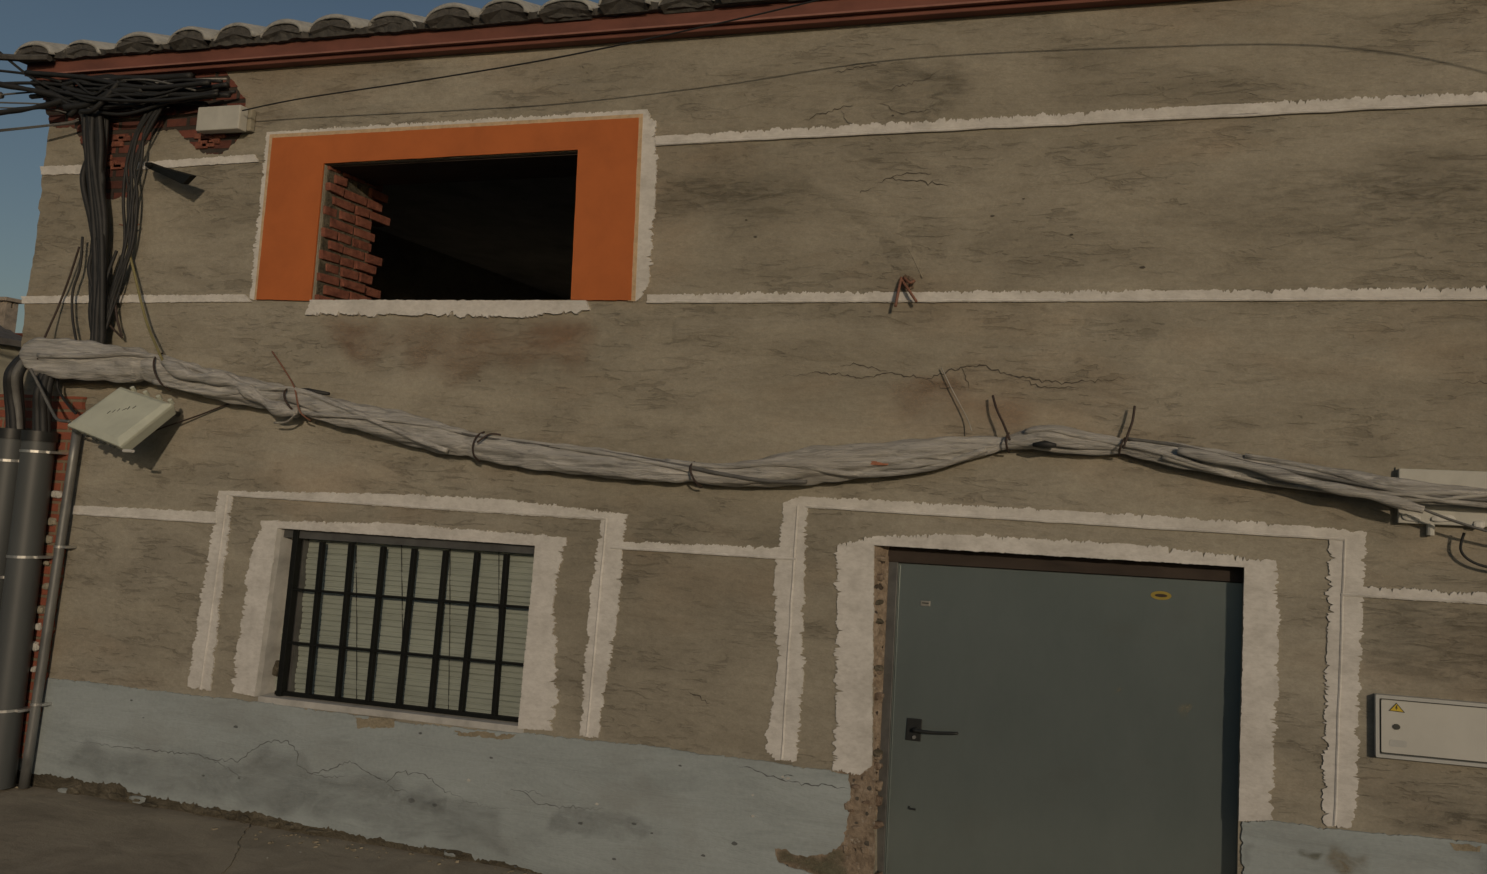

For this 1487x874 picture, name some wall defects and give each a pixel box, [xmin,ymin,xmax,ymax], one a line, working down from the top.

spalling [42,85,83,146]
spalling [106,71,246,200]
crack [784,363,1121,389]
spalling [774,545,889,874]
spalling [16,770,542,874]
crack [76,740,598,810]